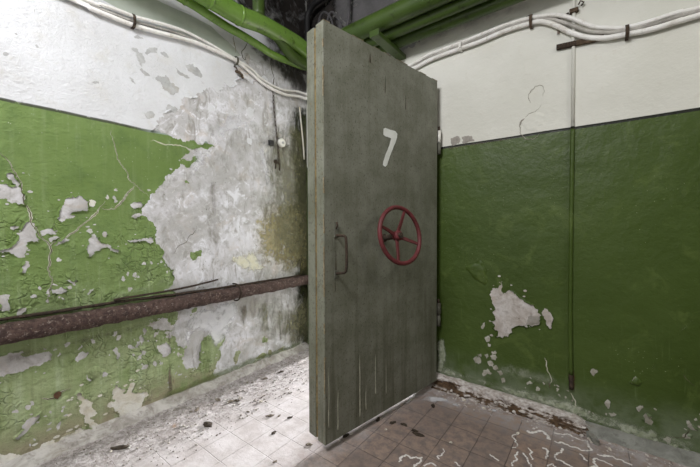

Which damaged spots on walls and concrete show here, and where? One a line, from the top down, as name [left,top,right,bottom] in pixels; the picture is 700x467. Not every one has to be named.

crack [519,85,544,140]
crack [0,132,148,298]
peeling [0,47,307,297]
leakage [233,108,308,342]
peeling [0,294,28,315]
peeling [0,342,70,383]
peeling [30,277,78,303]
peeling [12,286,305,448]
peeling [473,275,553,383]
leakage [504,387,686,450]